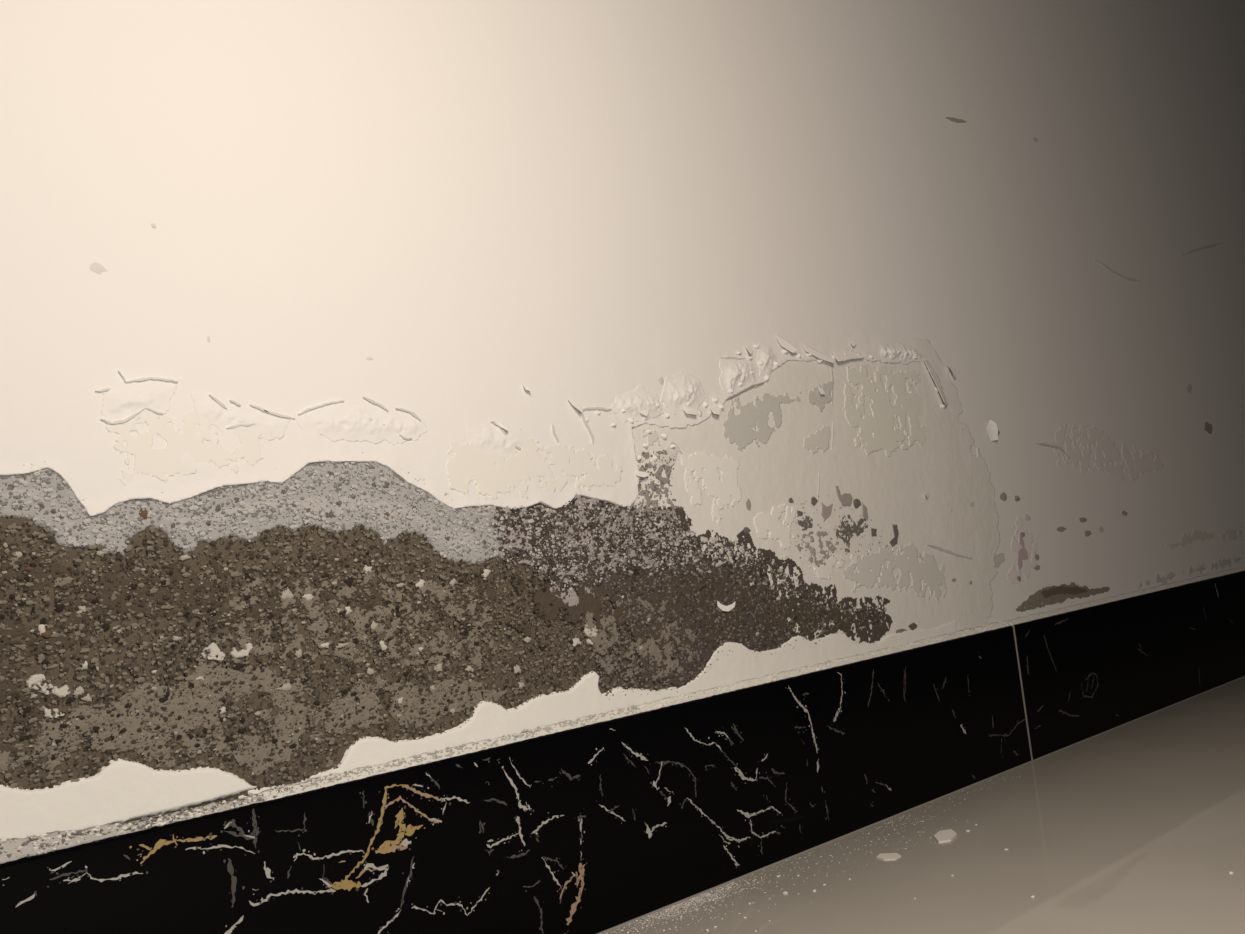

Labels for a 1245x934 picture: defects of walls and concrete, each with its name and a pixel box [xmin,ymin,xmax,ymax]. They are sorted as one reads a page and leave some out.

peeling [0,334,1000,824]